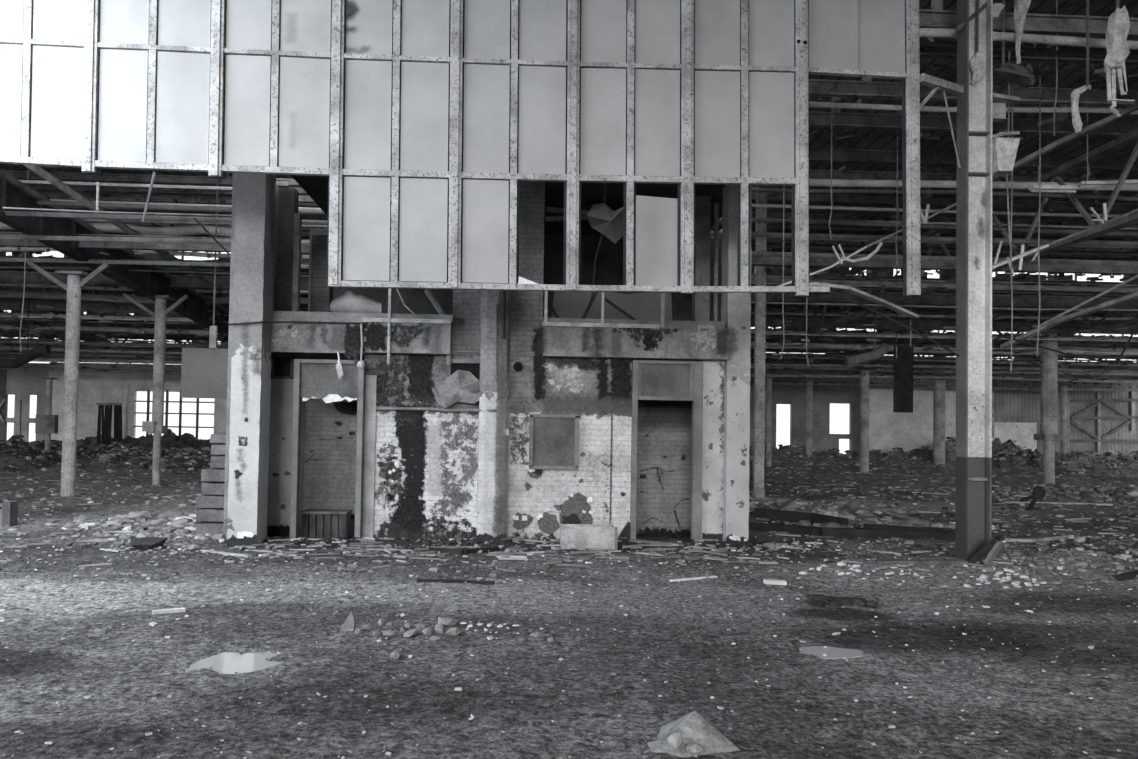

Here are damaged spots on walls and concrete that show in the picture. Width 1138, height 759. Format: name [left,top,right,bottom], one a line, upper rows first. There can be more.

damp [531,327,692,427]
damp [308,322,477,541]
peeling [426,412,478,517]
spalling [475,479,626,541]